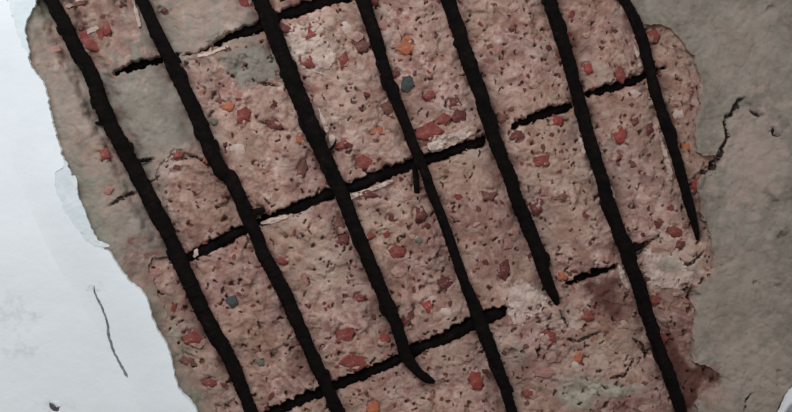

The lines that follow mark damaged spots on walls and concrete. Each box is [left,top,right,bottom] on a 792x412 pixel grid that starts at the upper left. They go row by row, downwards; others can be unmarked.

rust [623,5,640,43]
rust [375,60,400,92]
crack [700,98,780,175]
spalling [8,0,330,412]
spalling [149,0,675,412]
spalling [557,0,792,412]
rust [588,281,620,315]
rust [488,360,514,405]
rust [666,334,714,407]